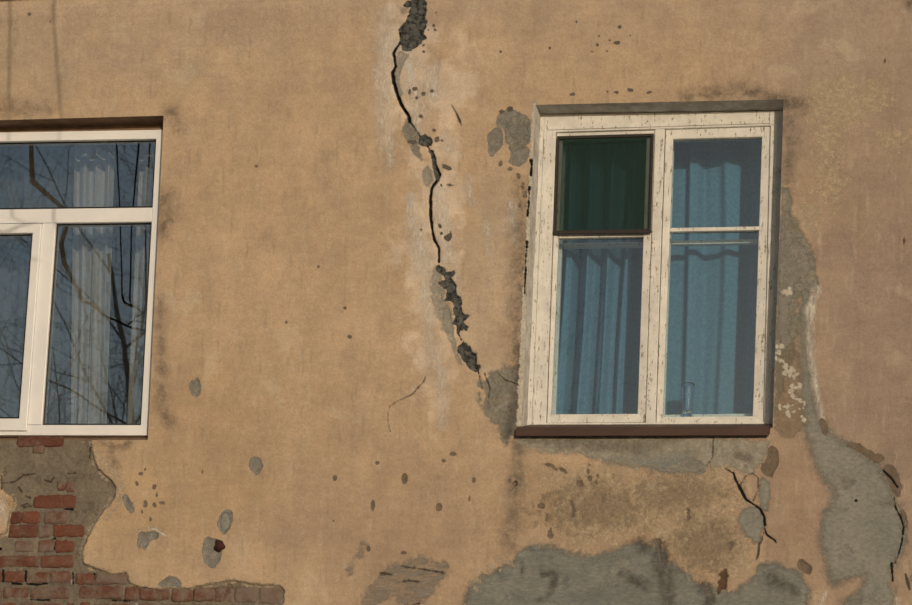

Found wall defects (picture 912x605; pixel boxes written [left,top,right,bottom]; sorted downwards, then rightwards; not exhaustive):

crack [375,0,481,423]
flaking render [487,102,537,426]
spalling [189,378,201,397]
spalling [95,452,167,550]
spalling [202,509,233,568]
spalling [249,456,263,475]
spalling [717,569,729,594]
crack [706,438,777,560]
flaking render [761,446,779,477]
spalling [797,559,812,574]
flaking render [847,442,903,497]
crack [883,470,911,590]